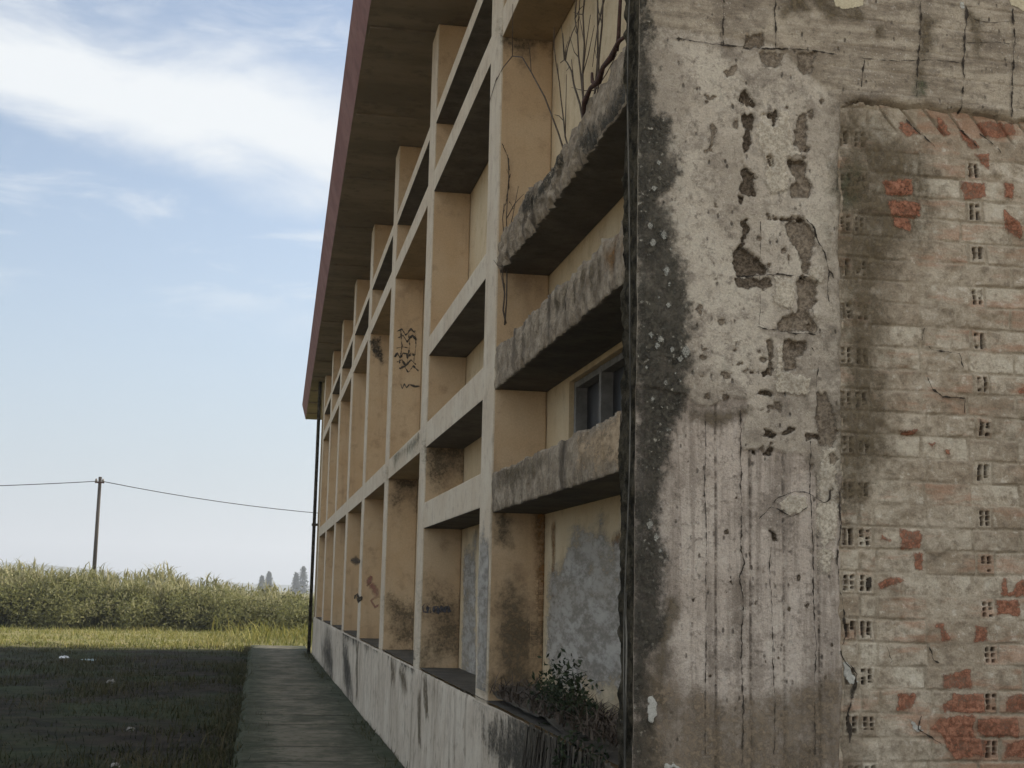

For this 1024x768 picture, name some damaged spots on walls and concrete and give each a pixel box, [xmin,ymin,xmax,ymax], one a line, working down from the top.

crack [671,0,837,55]
crack [861,1,1016,153]
flaking render [733,89,824,204]
flaking render [937,117,1016,170]
flaking render [1004,210,1023,239]
leakage [633,0,863,768]
crack [739,410,857,762]
flaking render [996,578,1024,616]
leakage [321,593,460,703]
leakage [417,678,428,748]
leakage [482,711,553,768]
flaking render [911,669,1024,760]